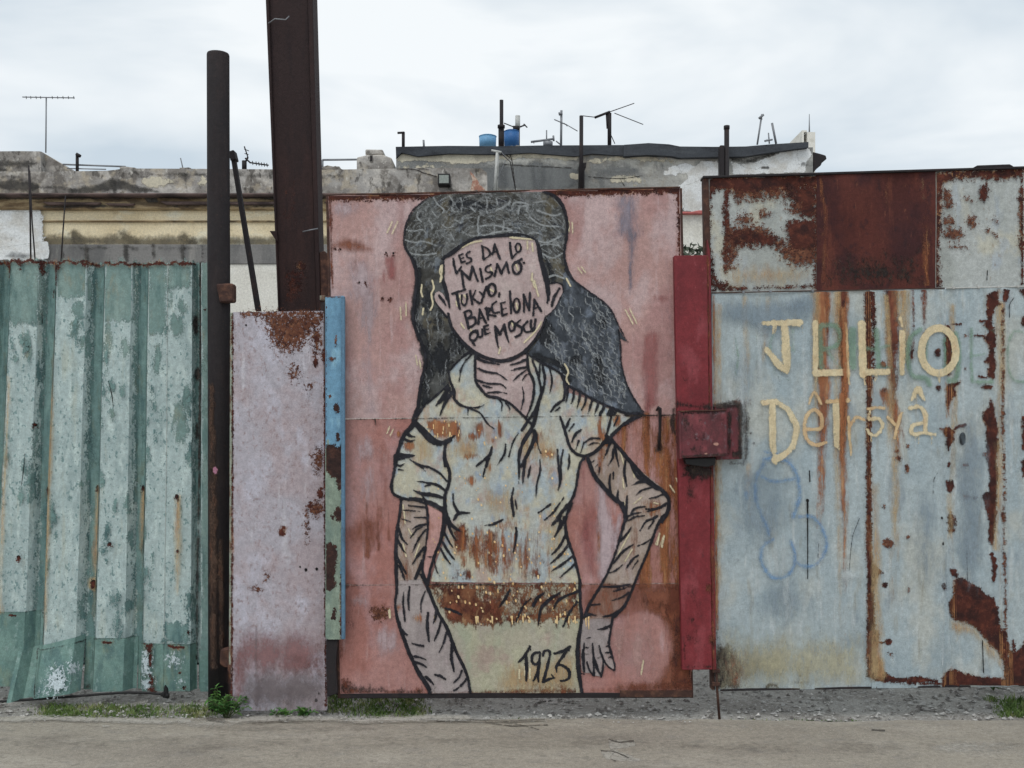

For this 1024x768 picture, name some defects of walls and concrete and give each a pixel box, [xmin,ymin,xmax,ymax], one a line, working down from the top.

peeling [0,210,208,703]
corrosion [0,247,358,707]
corrosion [395,417,509,460]
corrosion [429,380,754,693]
corrosion [707,169,1024,687]